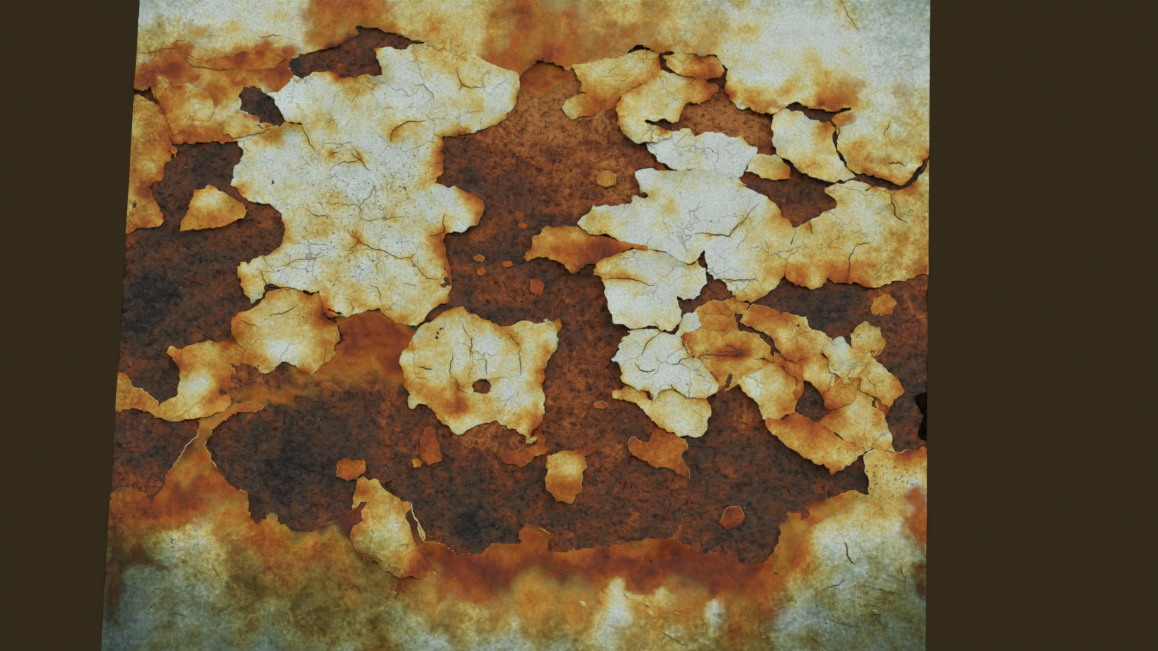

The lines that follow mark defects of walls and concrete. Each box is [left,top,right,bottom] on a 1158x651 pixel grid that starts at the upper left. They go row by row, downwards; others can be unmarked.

crack [241,127,445,327]
peeling [115,37,597,504]
crack [390,70,475,143]
crack [419,326,487,393]
corrosion [104,0,871,651]
peeling [523,49,929,478]
crack [696,203,759,251]
corrosion [670,89,929,228]
corrosion [677,274,928,452]
peeling [336,458,436,580]
peeling [719,506,745,530]
corrosion [902,486,927,596]